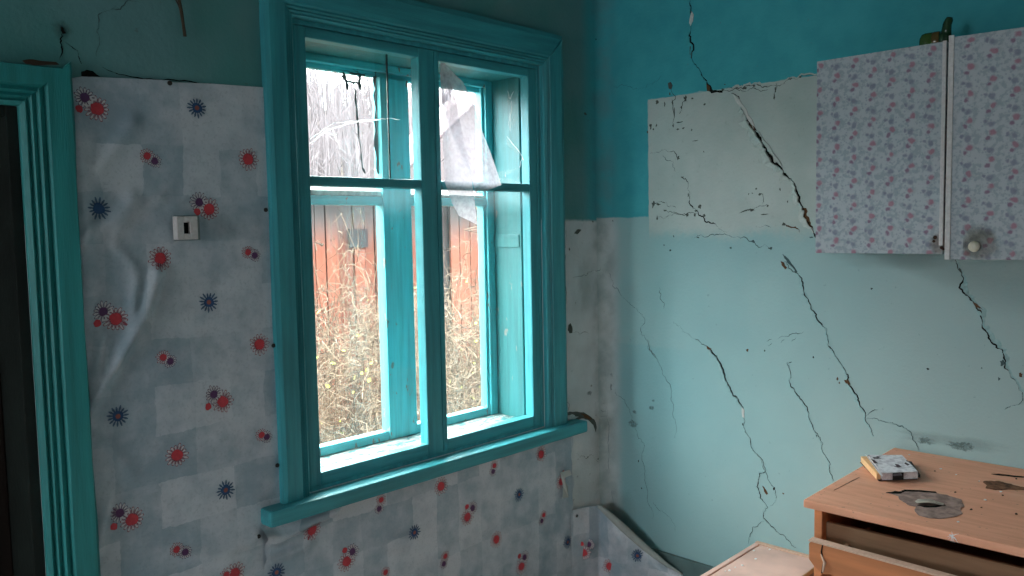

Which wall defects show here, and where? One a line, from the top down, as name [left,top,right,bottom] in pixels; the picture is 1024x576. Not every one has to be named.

crack [96,0,210,84]
flaking render [647,76,817,246]
crack [652,0,918,447]
crack [565,222,797,549]
crack [786,362,833,481]
crack [955,260,1024,409]